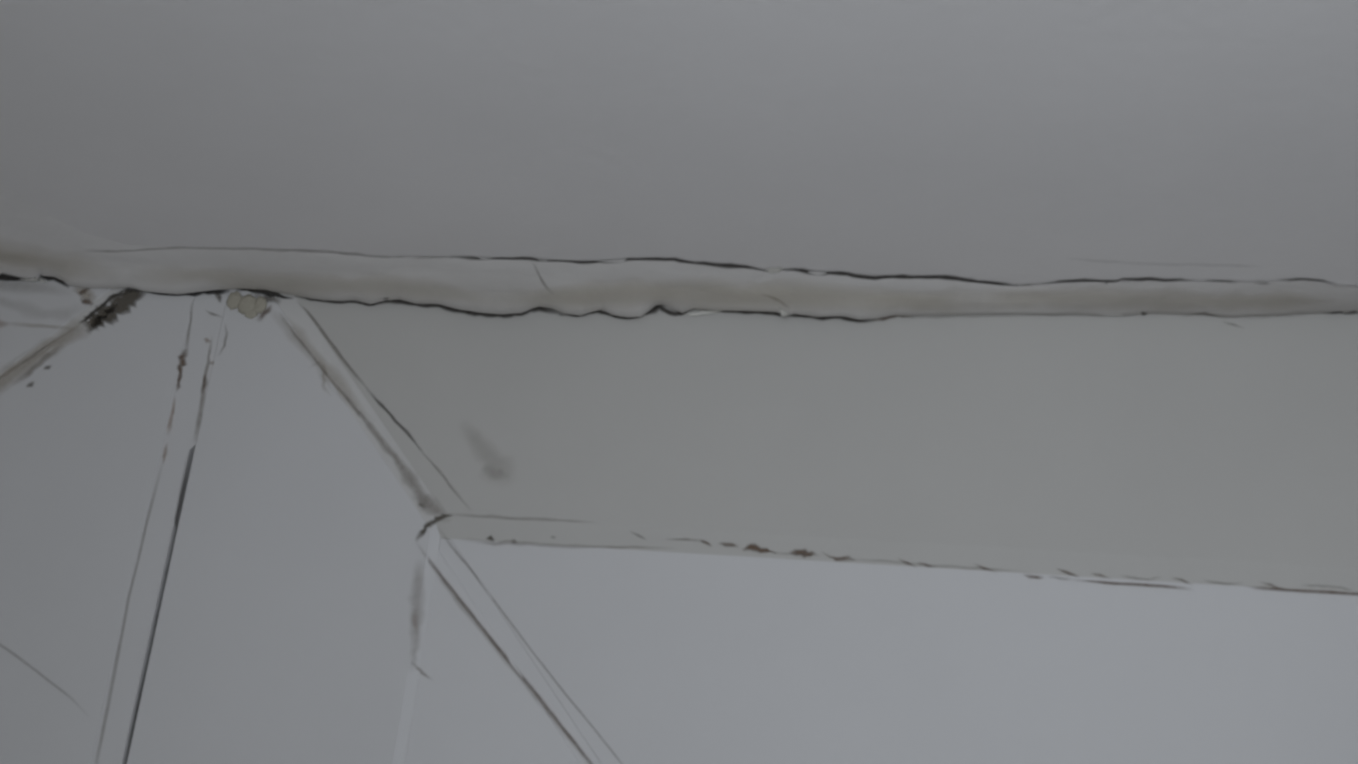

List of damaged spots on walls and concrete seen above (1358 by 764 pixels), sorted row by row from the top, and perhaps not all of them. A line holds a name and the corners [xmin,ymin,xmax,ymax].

crack [471,257,756,269]
crack [791,269,1008,285]
crack [1057,276,1182,284]
crack [148,289,225,297]
crack [1262,278,1357,314]
crack [305,298,905,322]